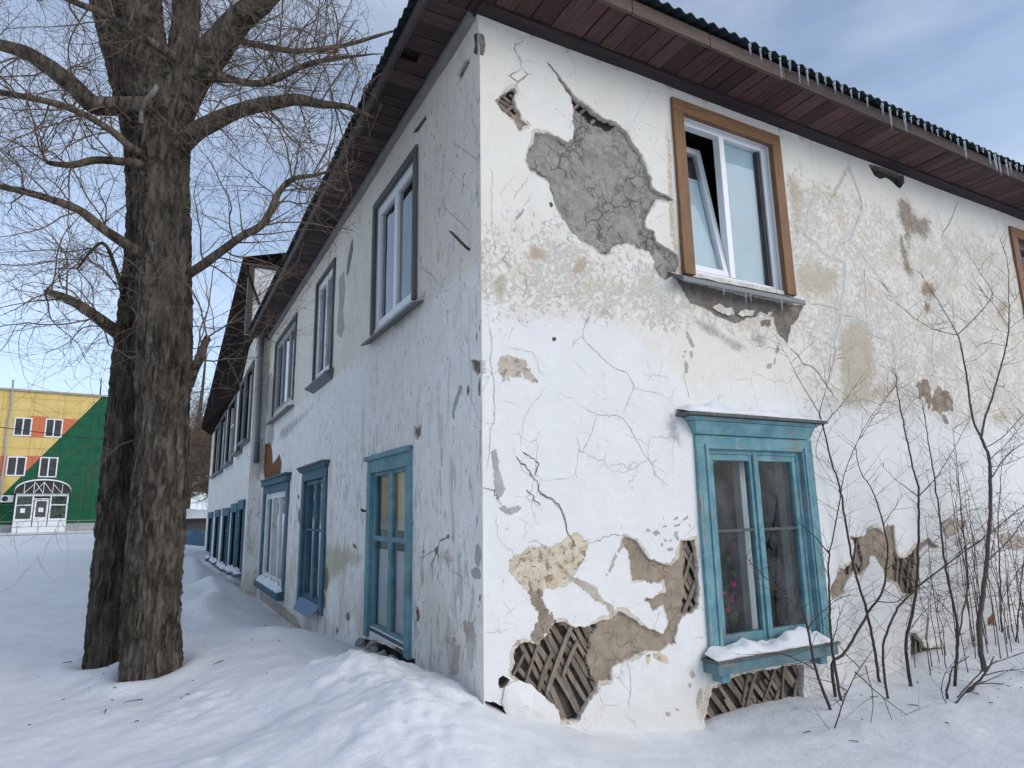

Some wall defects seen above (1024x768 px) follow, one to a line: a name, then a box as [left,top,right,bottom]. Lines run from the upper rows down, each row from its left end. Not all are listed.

spalling [263,372,282,479]
peeling [452,354,539,419]
crack [421,324,620,665]
crack [448,142,689,486]
spalling [498,516,701,725]
spalling [495,62,805,373]
spalling [830,517,966,600]
peeling [916,379,953,424]